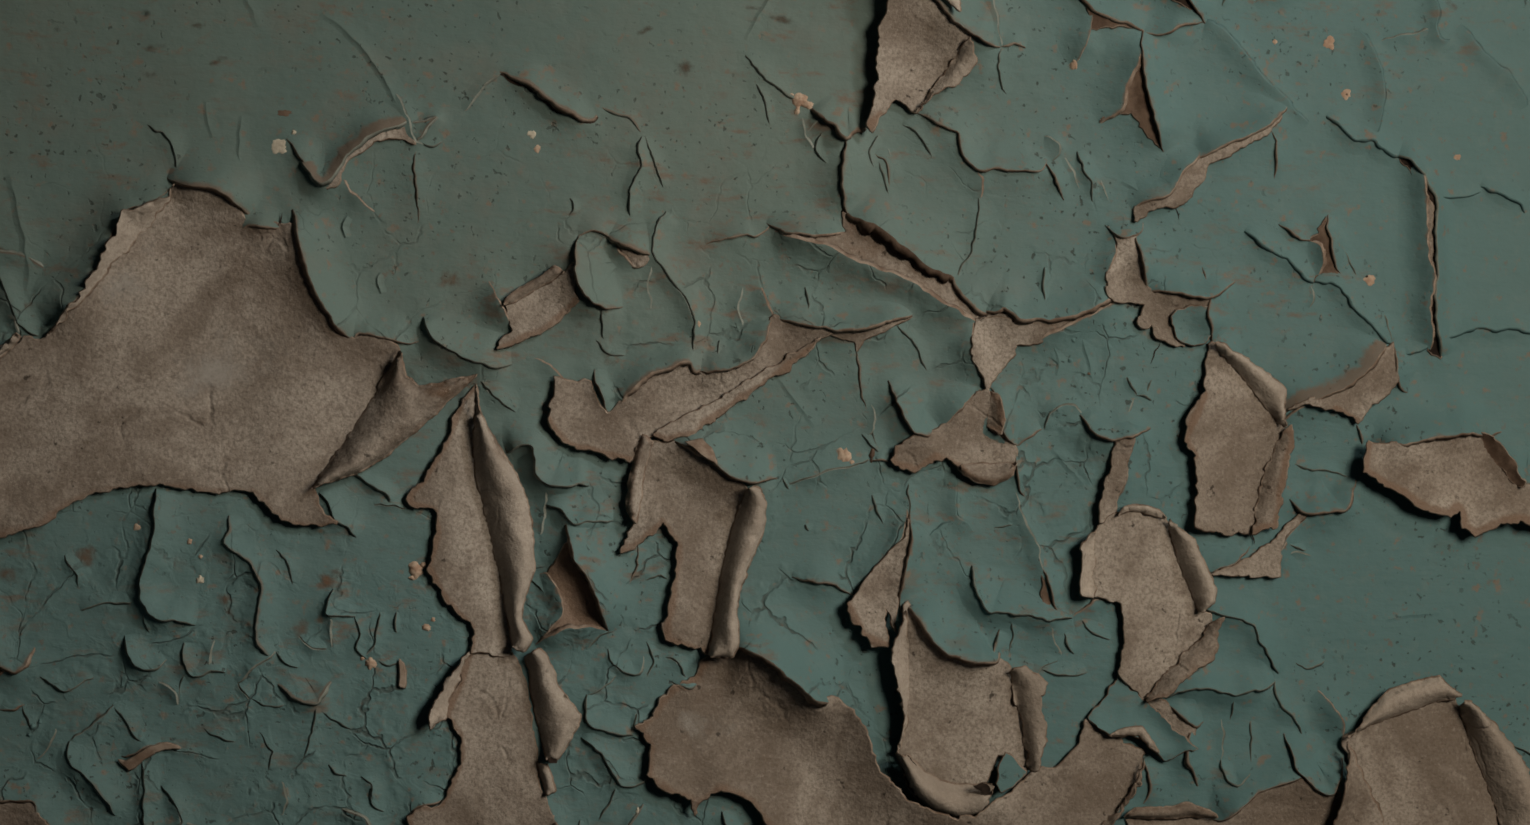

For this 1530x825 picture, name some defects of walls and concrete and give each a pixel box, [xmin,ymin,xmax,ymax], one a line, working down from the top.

peeling [0,127,477,539]
peeling [461,206,650,350]
flaking render [790,93,814,115]
peeling [866,0,1072,200]
crack [984,0,1017,94]
peeling [1056,0,1530,544]
crack [1244,0,1530,359]
peeling [0,591,35,711]
crack [22,468,406,825]
peeling [404,288,1530,825]
peeling [0,745,94,825]